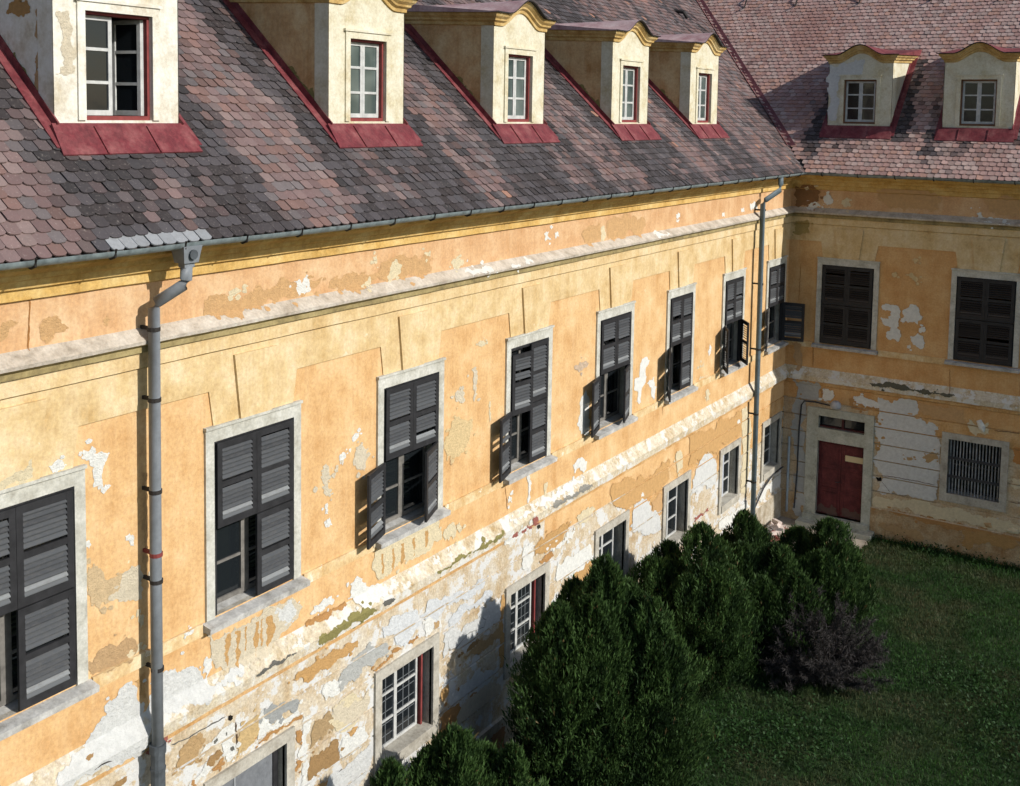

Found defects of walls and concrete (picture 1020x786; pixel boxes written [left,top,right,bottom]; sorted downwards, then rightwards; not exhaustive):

flaking render [634,357,656,404]
flaking render [78,439,111,494]
flaking render [630,492,661,536]
flaking render [691,452,717,496]
flaking render [718,407,781,530]
flaking render [853,393,1020,533]
flaking render [86,540,150,628]
flaking render [163,521,466,714]
flaking render [322,575,501,786]
flaking render [57,679,151,786]
flaking render [189,715,241,786]
spalling [258,699,313,786]